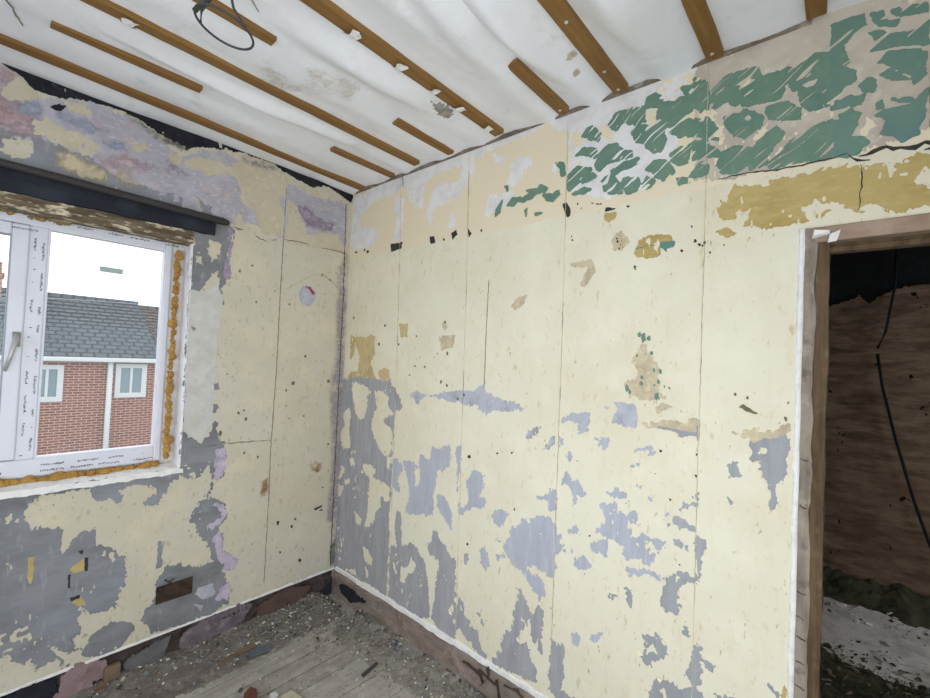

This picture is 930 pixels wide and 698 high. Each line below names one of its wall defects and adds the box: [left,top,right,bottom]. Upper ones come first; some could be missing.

flaking render [549,0,930,200]
flaking render [0,63,546,698]
peeling [334,376,708,698]
peeling [727,461,742,479]
peeling [749,434,791,514]
crack [691,63,930,698]
peeling [637,626,734,698]